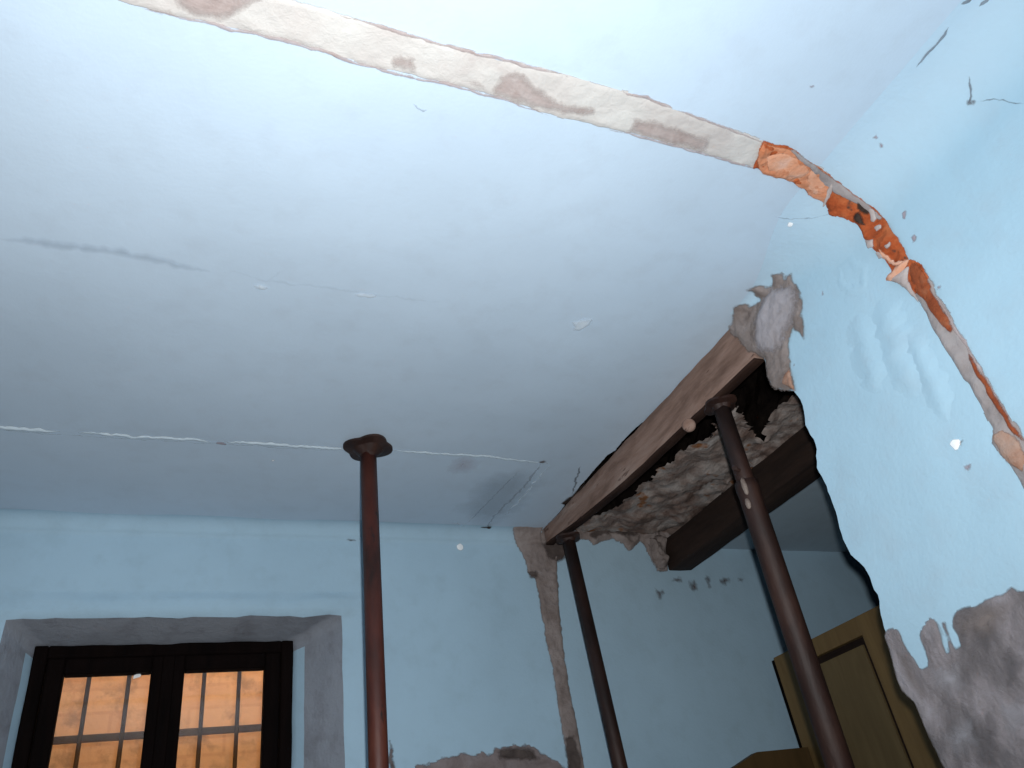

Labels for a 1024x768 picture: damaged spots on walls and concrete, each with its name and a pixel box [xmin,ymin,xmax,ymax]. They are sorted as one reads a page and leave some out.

spalling [166,13,556,110]
crack [918,30,947,65]
water stain [496,75,593,114]
water stain [632,122,707,149]
spalling [730,360,796,441]
crack [0,426,344,450]
crack [394,450,546,463]
spalling [558,423,642,514]
spalling [595,415,718,515]
peeling [740,477,751,509]
flaking render [885,588,1024,768]
flaking render [415,745,562,768]